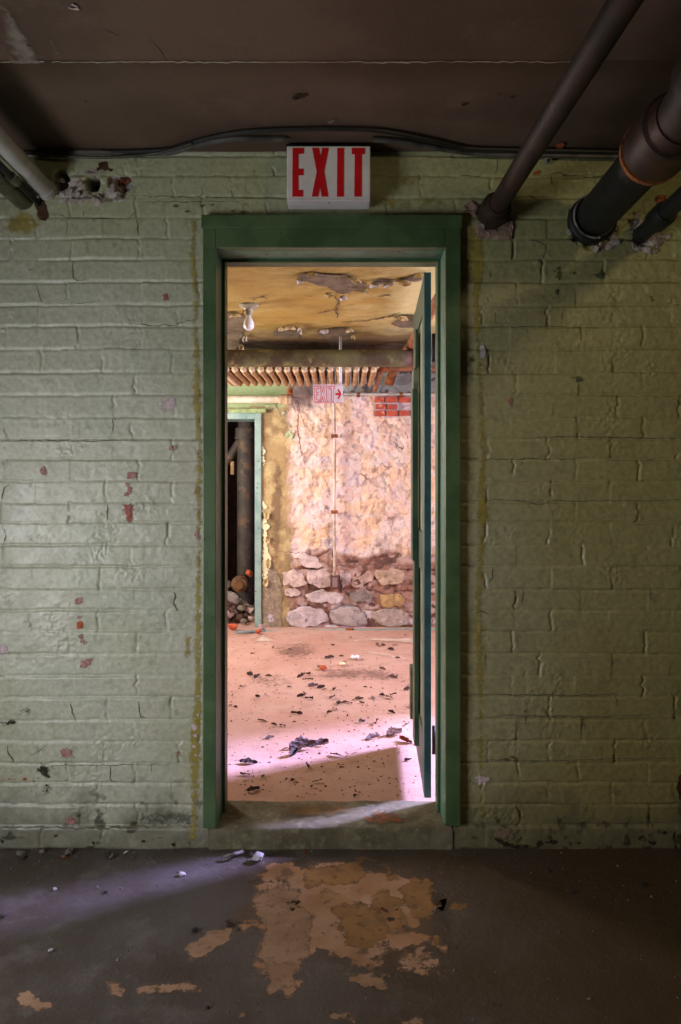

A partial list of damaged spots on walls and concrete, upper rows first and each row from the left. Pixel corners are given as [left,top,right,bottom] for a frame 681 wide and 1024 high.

spalling [56,169,132,207]
spalling [463,201,514,241]
spalling [593,211,671,254]
peeling [297,272,425,301]
damp [191,221,202,531]
peeling [122,472,139,522]
damp [142,552,202,840]
peeling [184,857,471,998]